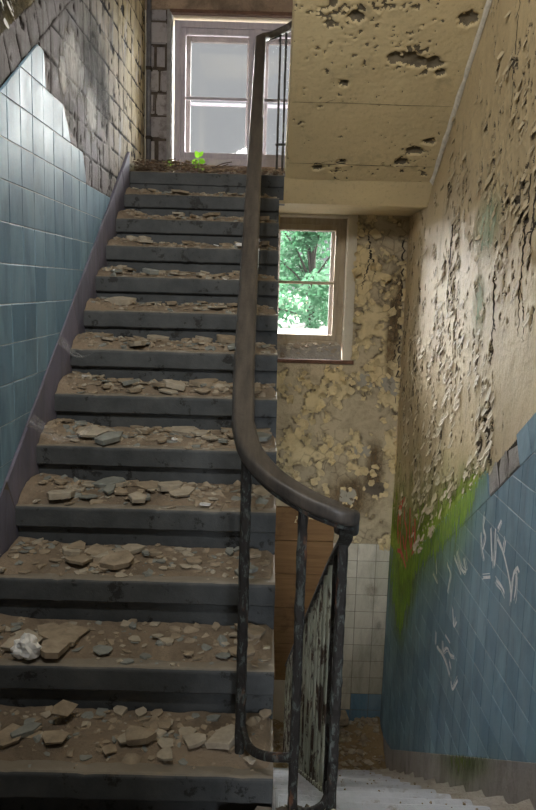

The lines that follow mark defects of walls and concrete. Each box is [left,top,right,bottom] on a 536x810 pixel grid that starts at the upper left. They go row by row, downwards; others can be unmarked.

spalling [295,0,440,53]
spalling [458,0,499,28]
peeling [0,0,145,197]
flaking render [257,19,536,553]
flaking render [251,486,288,506]
water stain [391,474,484,590]